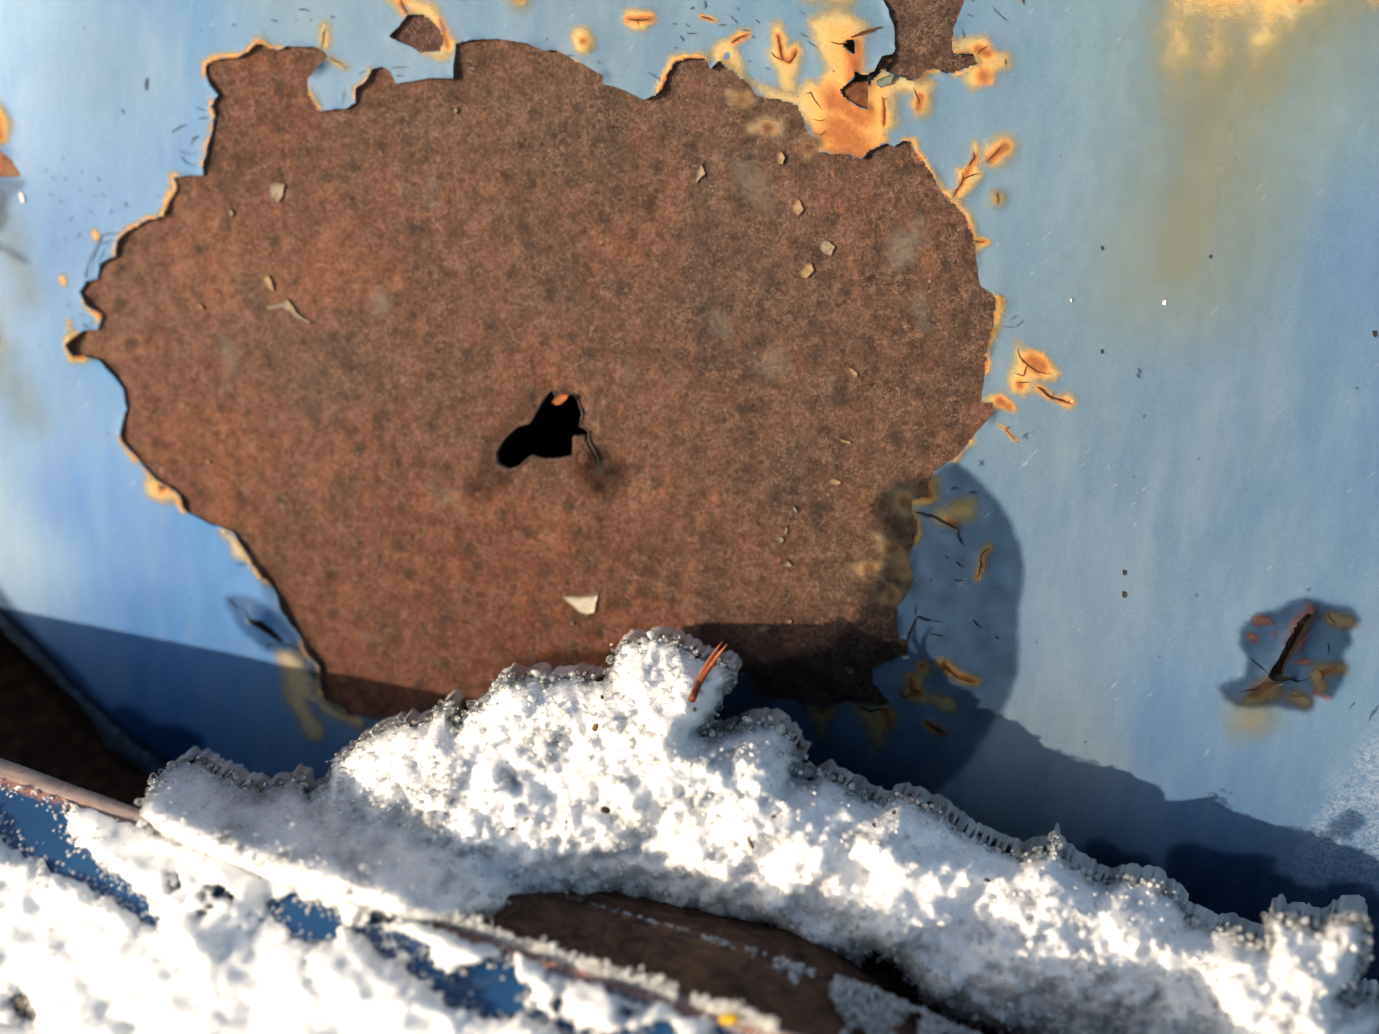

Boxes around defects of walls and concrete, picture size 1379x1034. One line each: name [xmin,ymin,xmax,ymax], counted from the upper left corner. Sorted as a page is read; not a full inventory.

rust [320,23,346,69]
rust [571,27,594,53]
rust [710,0,935,158]
rust [952,37,1010,89]
rust [1169,0,1315,66]
rust [0,106,10,144]
rust [952,136,1015,200]
peeling [63,0,1002,716]
rust [984,344,1075,442]
rust [145,478,178,503]
rust [217,528,245,566]
rust [277,650,365,740]